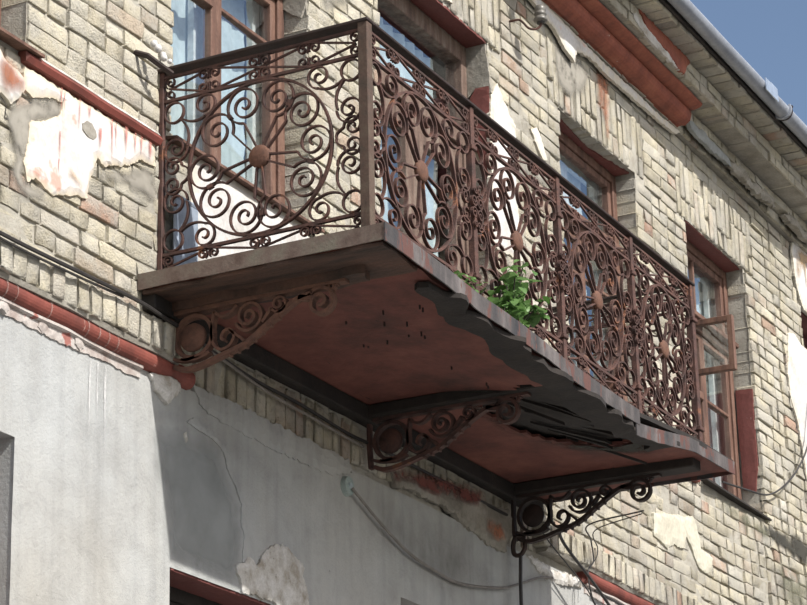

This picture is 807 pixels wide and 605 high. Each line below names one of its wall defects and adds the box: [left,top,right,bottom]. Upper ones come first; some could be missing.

peeling [0,49,156,199]
peeling [470,83,516,138]
peeling [475,123,523,262]
peeling [528,0,681,135]
peeling [725,162,807,315]
peeling [784,333,807,481]
spalling [235,544,309,605]